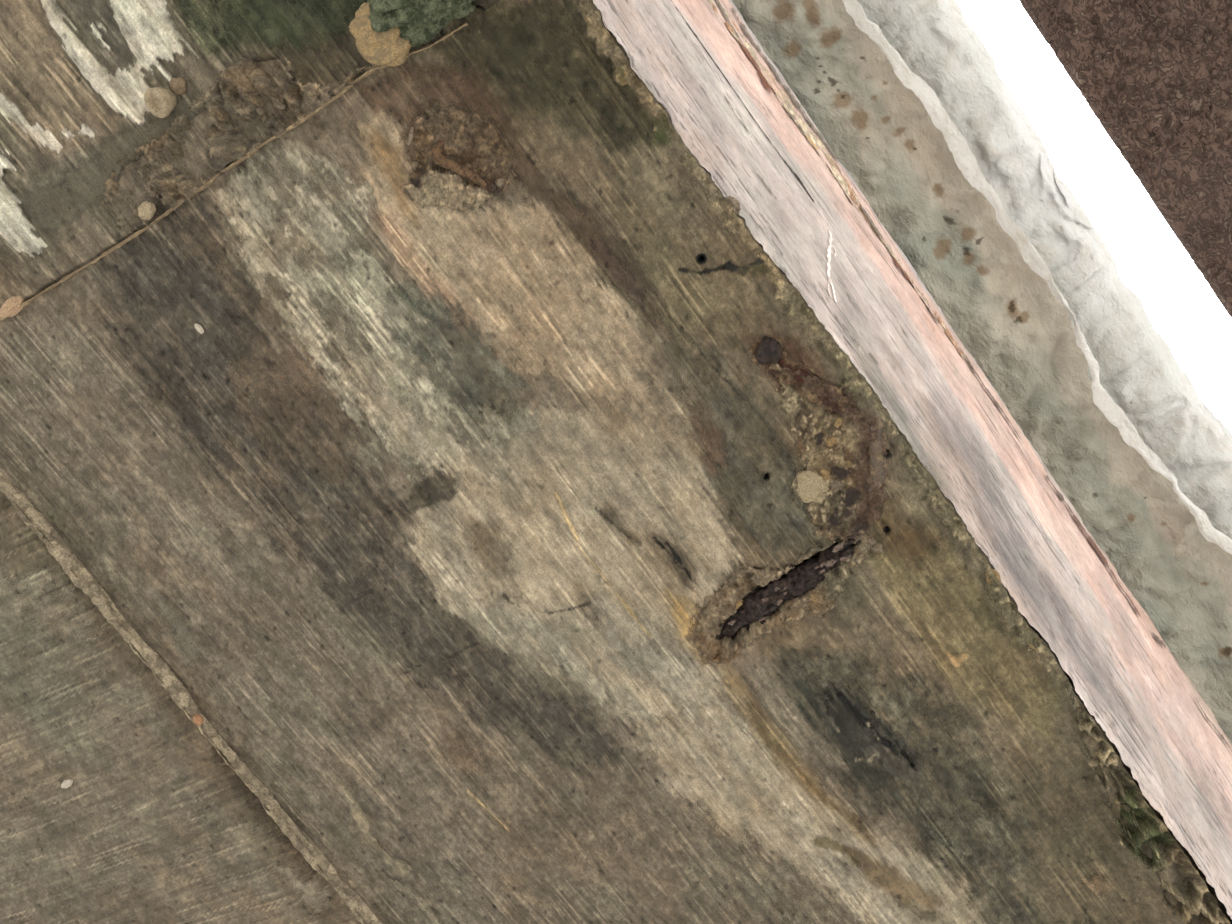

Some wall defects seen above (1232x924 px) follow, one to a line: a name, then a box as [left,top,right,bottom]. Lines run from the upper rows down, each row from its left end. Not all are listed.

water stain [7,568,96,644]
spalling [400,105,519,211]
water stain [87,32,1043,924]
spalling [578,0,1086,716]